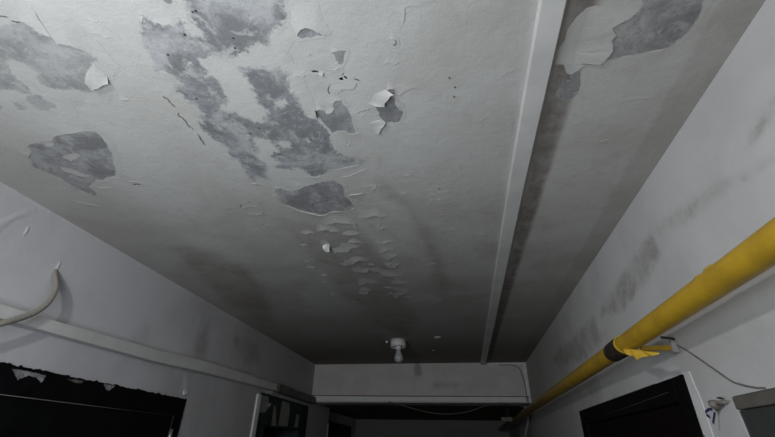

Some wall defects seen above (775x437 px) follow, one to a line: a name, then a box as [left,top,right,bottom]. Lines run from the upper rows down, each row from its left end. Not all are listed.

peeling [0,0,145,209]
peeling [116,0,381,221]
peeling [369,82,407,134]
peeling [552,0,713,100]